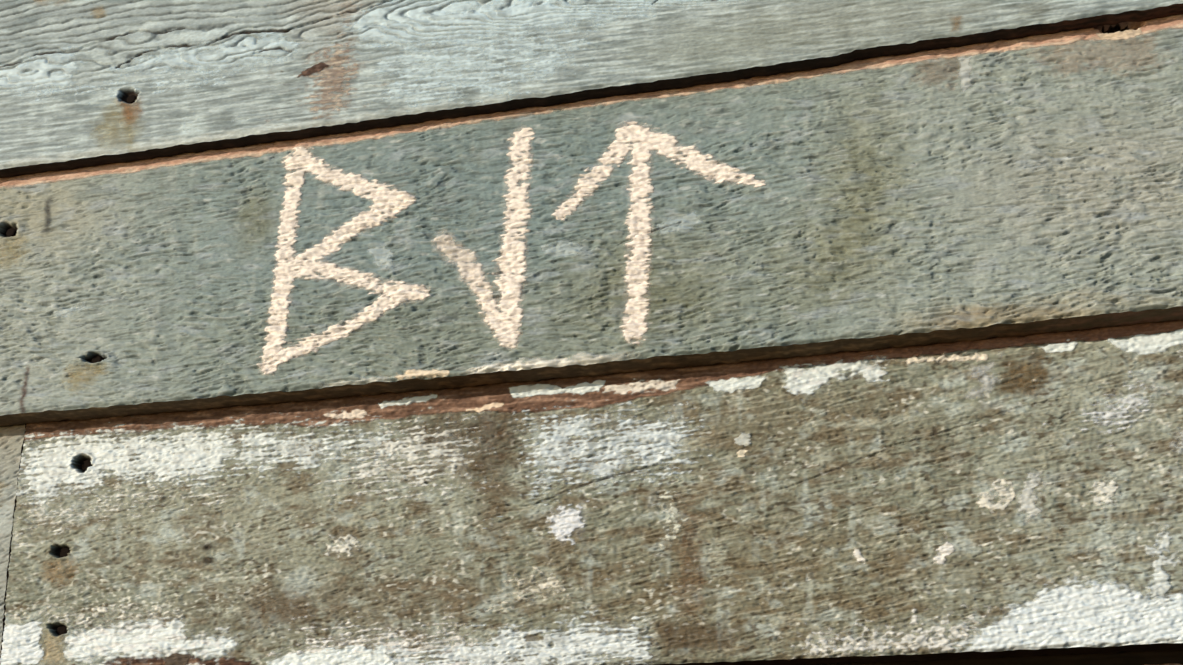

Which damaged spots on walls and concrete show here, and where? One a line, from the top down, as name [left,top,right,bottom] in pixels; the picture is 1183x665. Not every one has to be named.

spalling [326,369,449,387]
spalling [471,355,605,374]
peeling [705,376,765,393]
peeling [780,354,994,397]
peeling [1042,340,1077,353]
peeling [1108,329,1183,357]
peeling [12,379,712,549]
peeling [734,433,751,457]
peeling [976,471,1042,520]
peeling [792,525,1183,658]
peeling [0,595,251,665]
peeling [266,610,652,665]